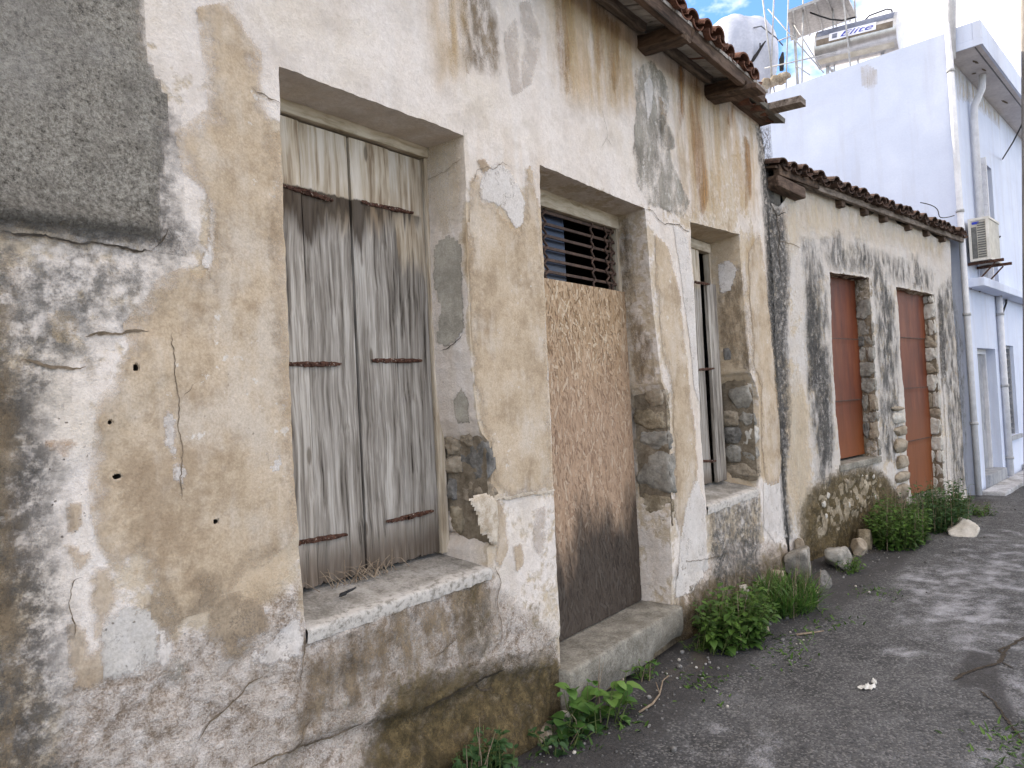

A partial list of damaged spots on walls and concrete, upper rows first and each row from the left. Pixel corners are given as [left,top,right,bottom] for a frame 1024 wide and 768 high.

peeling [505,3,539,93]
spalling [634,62,690,214]
crack [4,230,168,253]
crack [85,329,197,500]
peeling [66,3,295,689]
peeling [433,159,553,571]
peeling [633,235,698,536]
peeling [722,236,783,486]
water stain [757,126,929,538]
crack [199,677,262,739]
crack [251,717,363,768]